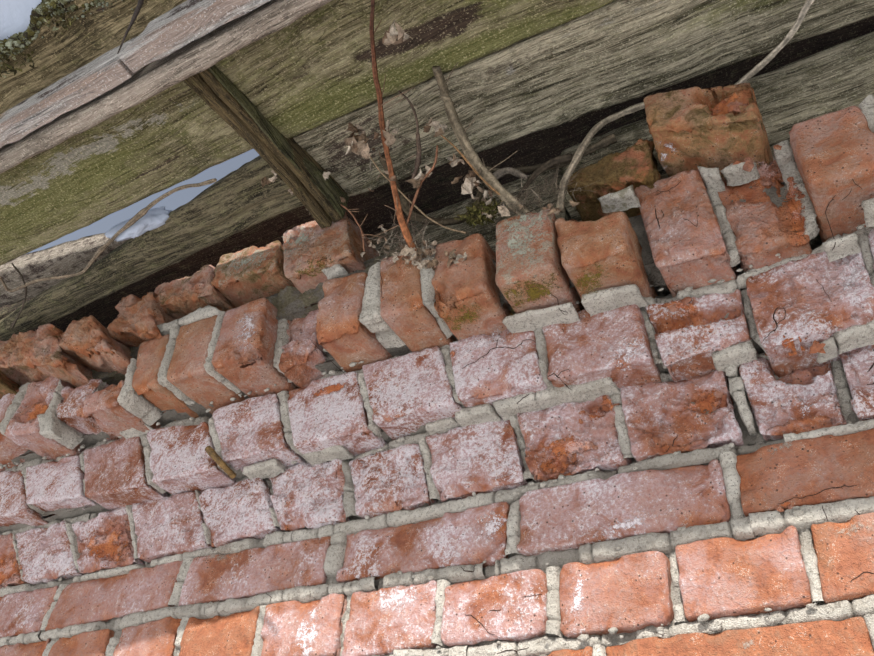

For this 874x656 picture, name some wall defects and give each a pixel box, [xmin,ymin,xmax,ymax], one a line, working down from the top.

spalling [733,145,806,245]
crack [763,307,786,341]
crack [462,333,535,369]
spalling [533,435,598,477]
crack [780,485,857,521]
efflorescence [475,512,507,539]
efflorescence [603,517,642,536]
spalling [86,526,131,572]
spalling [0,557,22,587]
efflorescence [378,586,417,611]
efflorescence [572,573,588,620]
efflorescence [295,610,319,656]